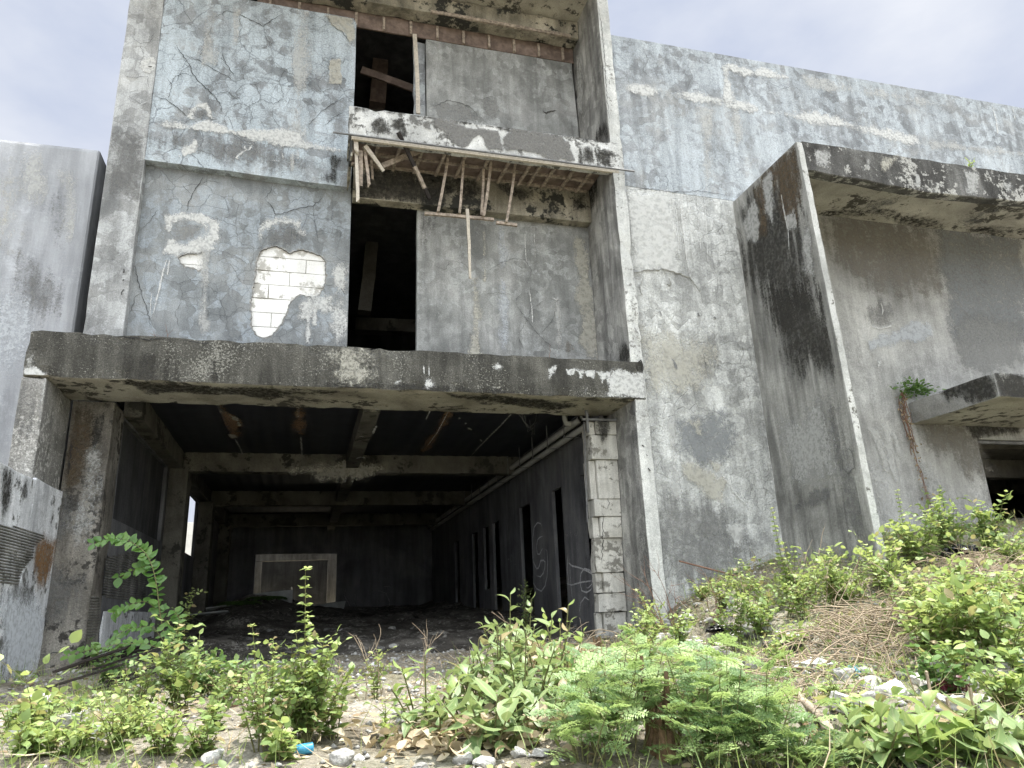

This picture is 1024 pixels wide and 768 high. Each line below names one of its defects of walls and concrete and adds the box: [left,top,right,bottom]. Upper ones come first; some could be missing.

crack [127,11,343,128]
peeling [423,118,575,161]
crack [264,186,321,237]
crack [115,233,250,344]
peeling [177,251,205,272]
peeling [249,245,328,339]
leakage [738,186,834,379]
peeling [548,360,646,398]
rust [34,535,57,589]